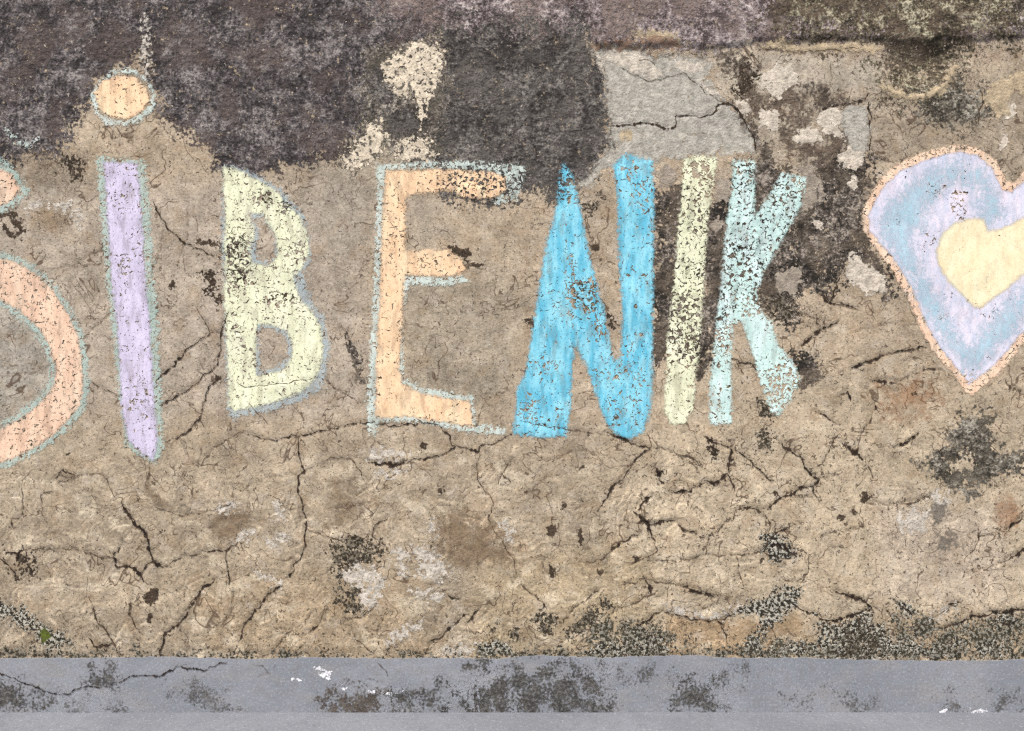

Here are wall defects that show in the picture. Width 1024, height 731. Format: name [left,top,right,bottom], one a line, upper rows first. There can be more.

leakage [0,0,616,220]
crack [610,53,757,151]
crack [0,309,1024,695]
leakage [909,405,1024,550]
leakage [314,657,656,713]
leakage [667,663,750,713]